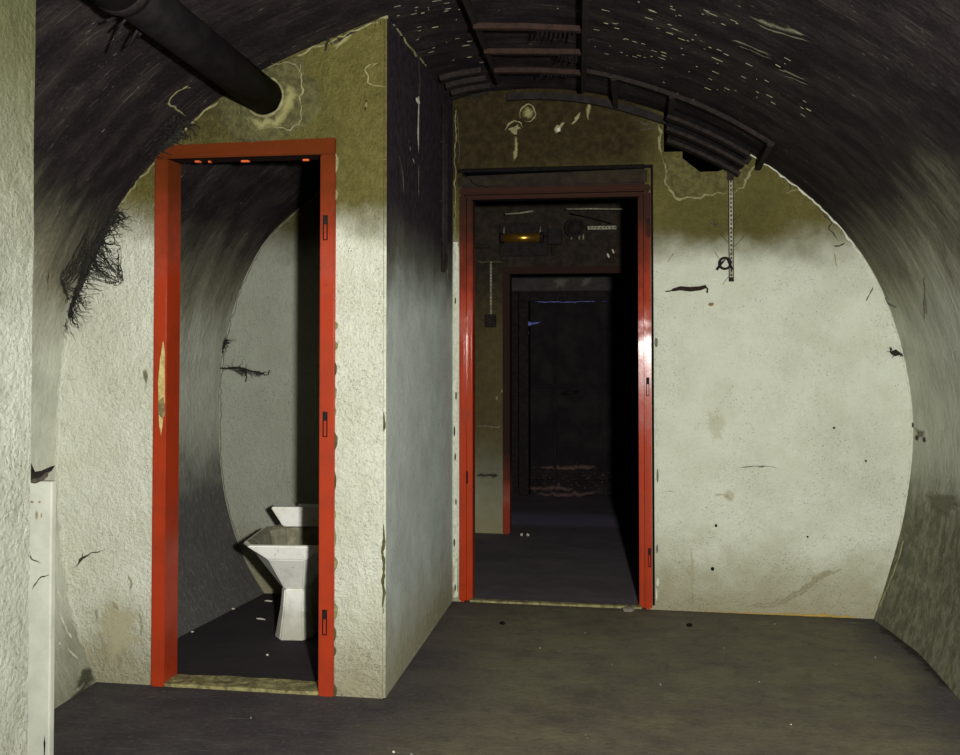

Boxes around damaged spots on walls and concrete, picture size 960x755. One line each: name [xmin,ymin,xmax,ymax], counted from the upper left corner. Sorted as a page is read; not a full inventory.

peeling [505,104,536,159]
crack [75,549,106,567]